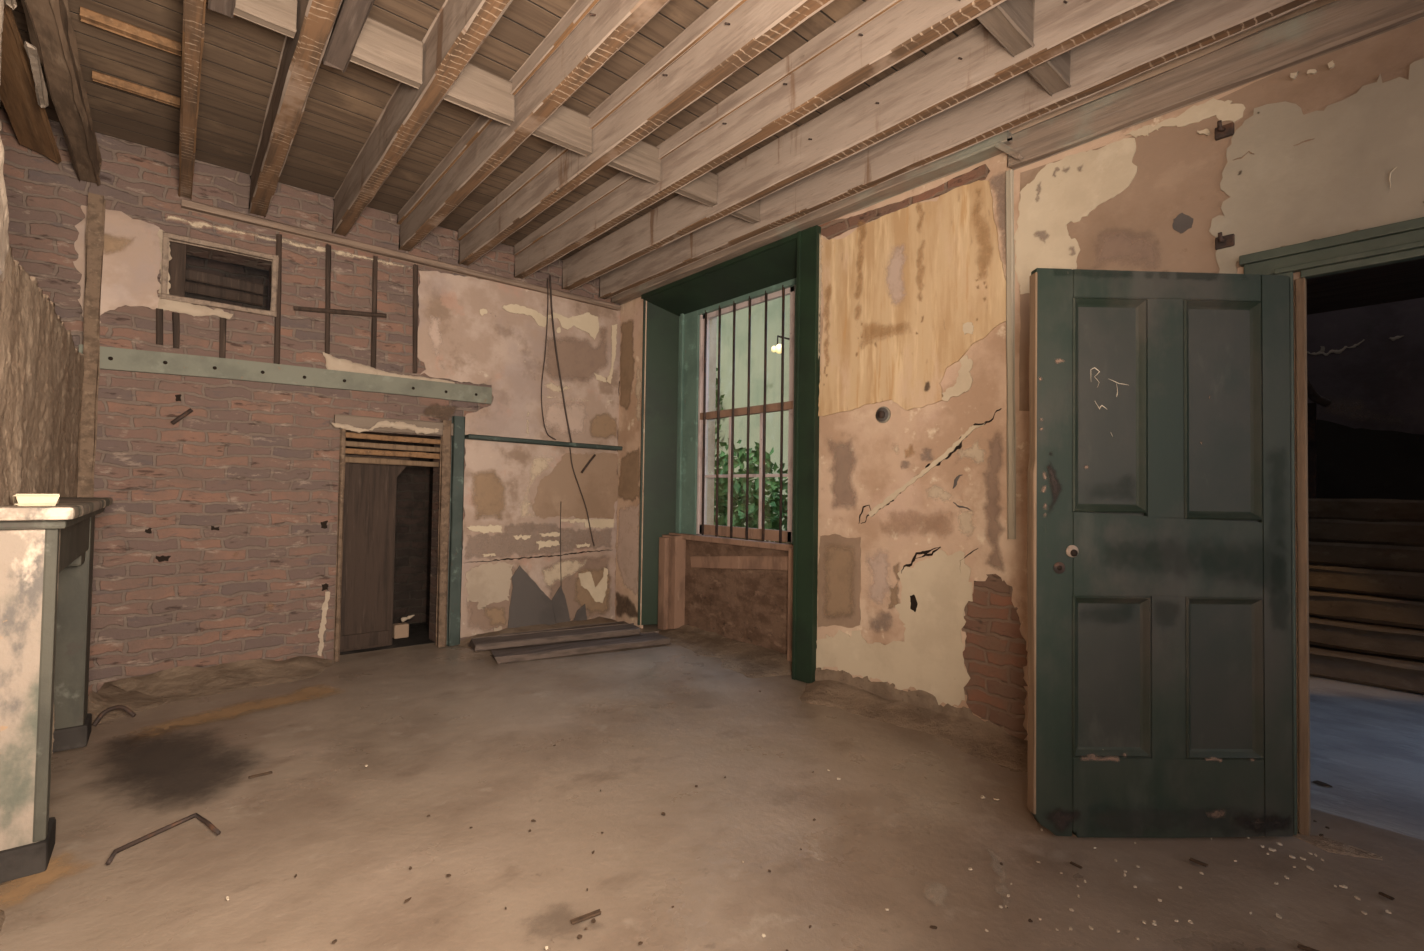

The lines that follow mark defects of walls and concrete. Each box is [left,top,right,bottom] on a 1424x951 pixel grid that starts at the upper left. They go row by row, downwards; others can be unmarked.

flaking render [0,122,10,282]
peeling [1013,58,1424,294]
flaking render [480,304,617,384]
flaking render [465,452,618,631]
crack [859,408,1002,524]
crack [901,546,978,573]
flaking render [815,574,1028,740]
damp [107,685,336,801]